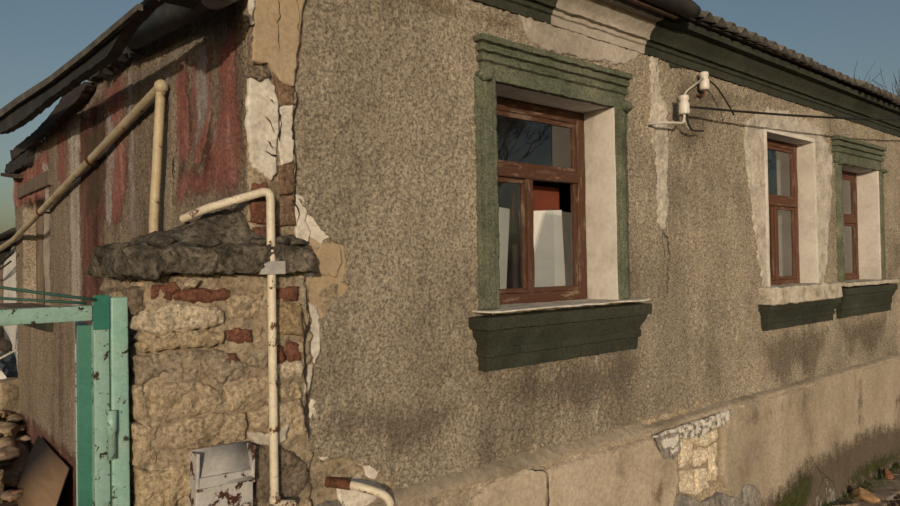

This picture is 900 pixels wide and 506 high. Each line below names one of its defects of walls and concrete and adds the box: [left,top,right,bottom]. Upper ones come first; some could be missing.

crack [277,0,300,222]
peeling [175,0,347,426]
flaking render [309,452,397,506]
flaking render [545,409,733,506]
flaking render [815,479,836,506]
water stain [761,427,900,506]